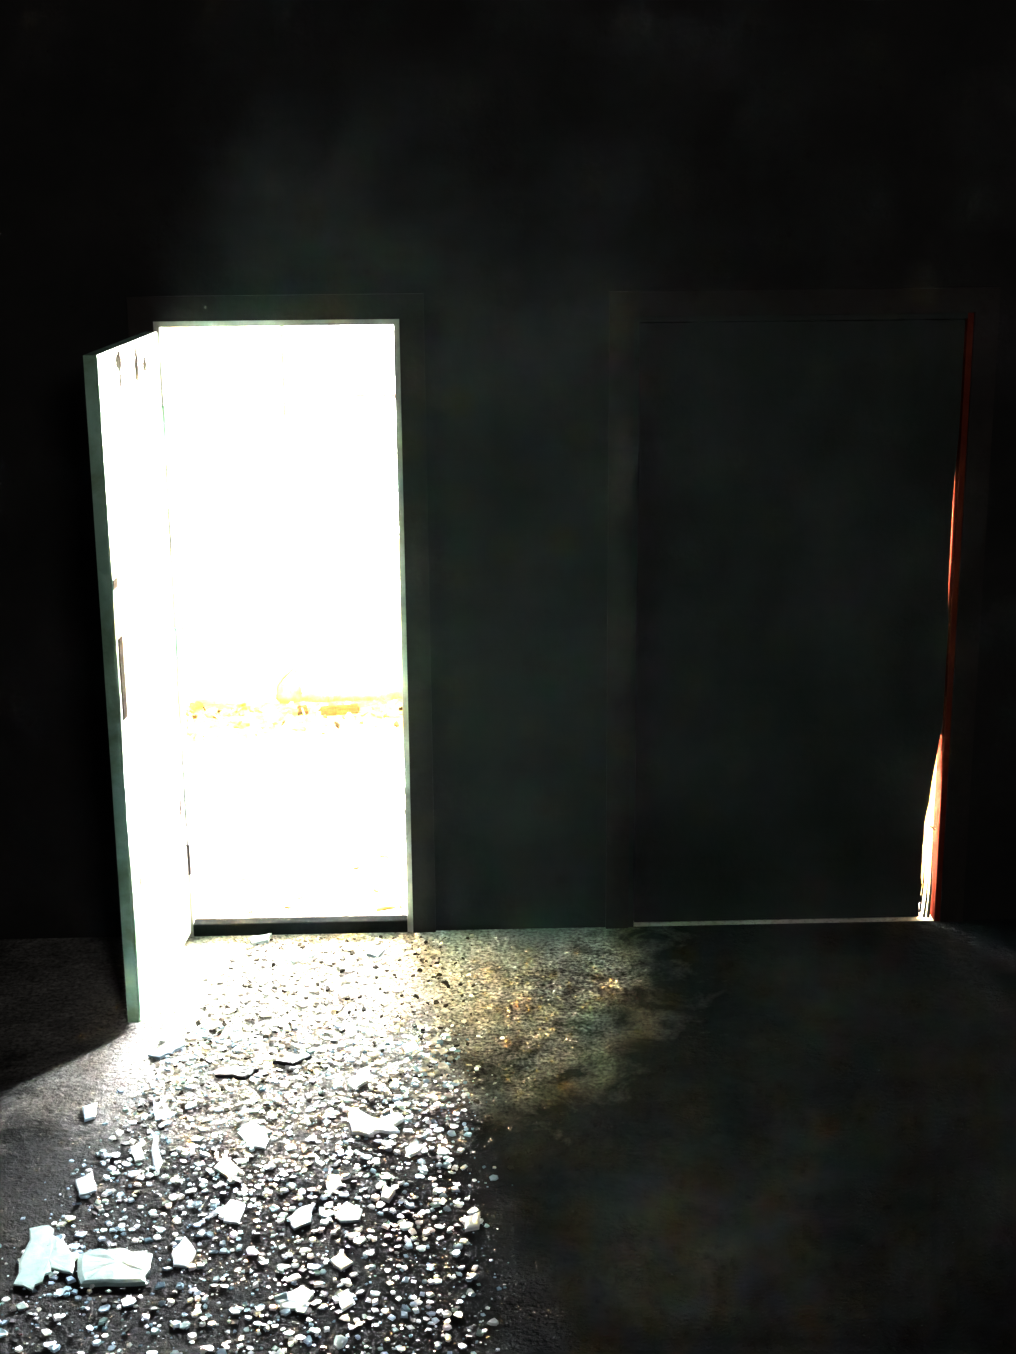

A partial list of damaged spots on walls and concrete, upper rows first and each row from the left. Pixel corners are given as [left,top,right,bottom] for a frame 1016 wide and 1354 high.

spalling [164,326,270,395]
spalling [275,531,402,704]